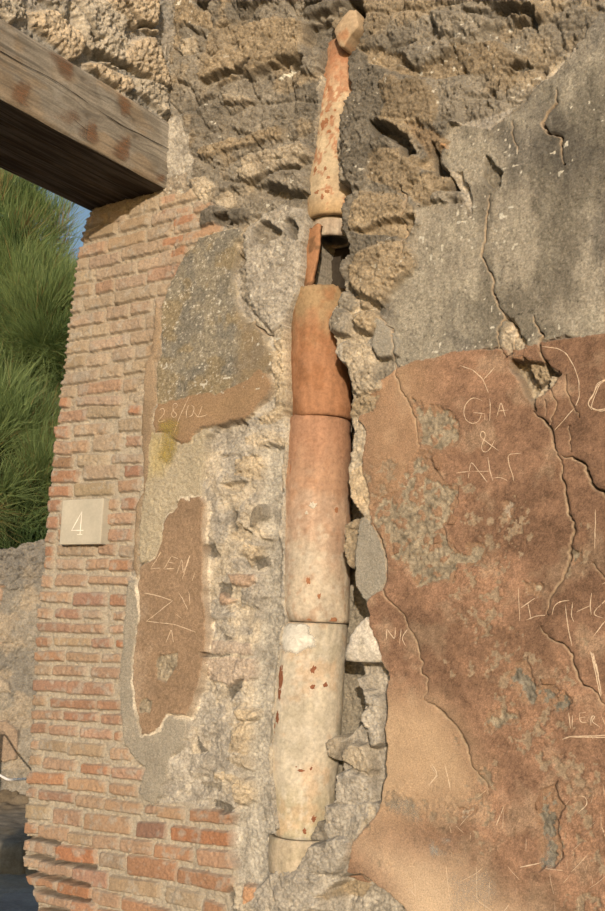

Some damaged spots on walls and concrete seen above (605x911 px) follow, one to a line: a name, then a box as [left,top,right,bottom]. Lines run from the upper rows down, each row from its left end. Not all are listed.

crack [487,88,566,165]
spalling [486,155,504,190]
crack [479,195,605,708]
spalling [370,398,487,588]
spalling [502,499,517,524]
spalling [157,652,178,681]
peeling [274,665,283,734]
crack [372,524,491,794]
spalling [535,781,566,870]